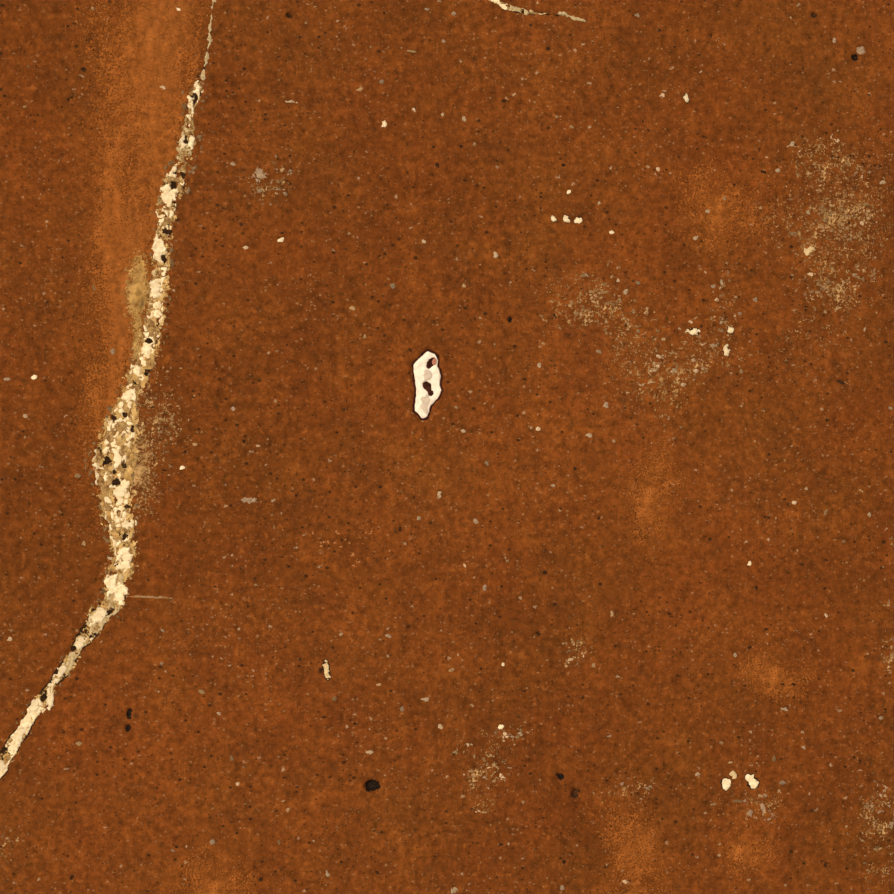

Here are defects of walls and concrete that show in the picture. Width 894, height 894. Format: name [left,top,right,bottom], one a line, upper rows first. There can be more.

crack [488,0,586,22]
crack [0,0,217,780]
spalling [411,349,444,421]